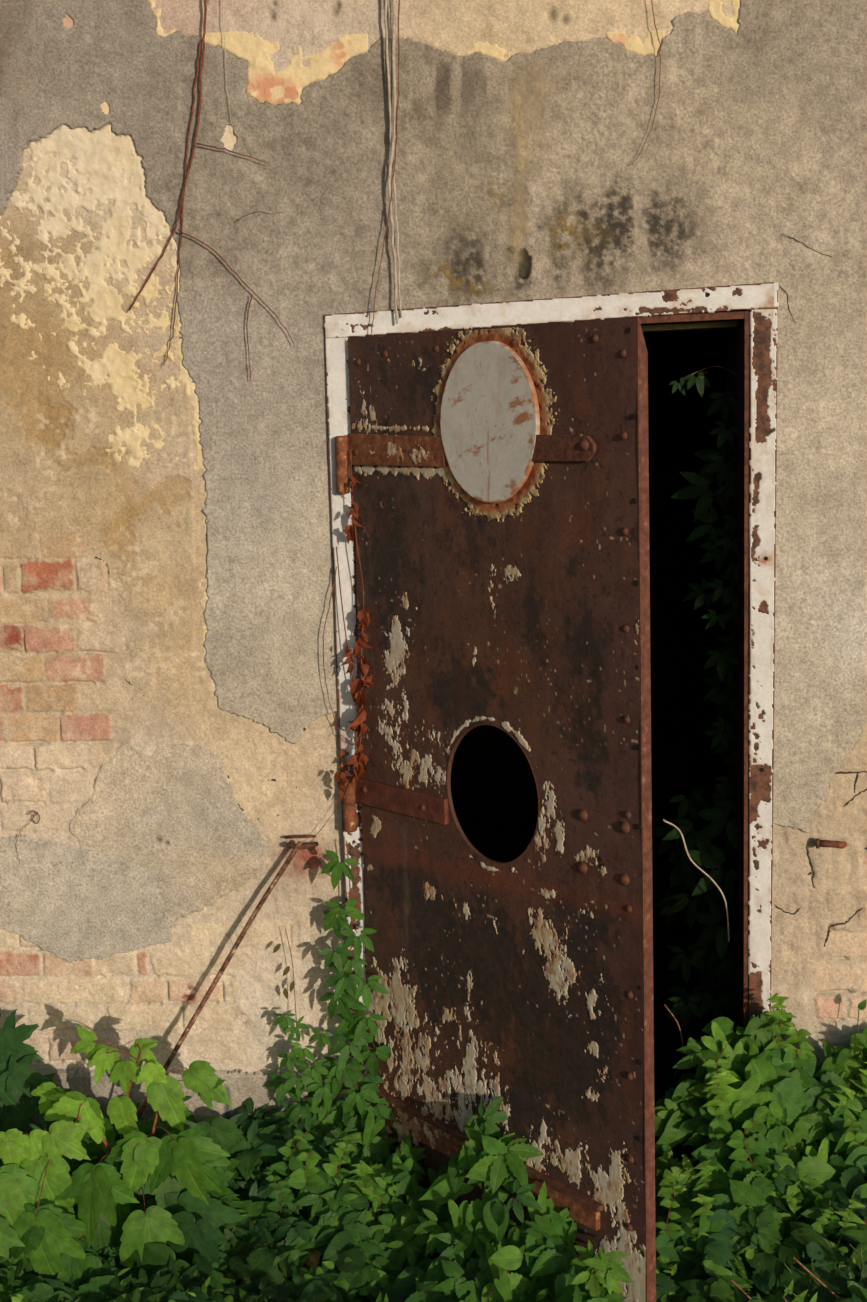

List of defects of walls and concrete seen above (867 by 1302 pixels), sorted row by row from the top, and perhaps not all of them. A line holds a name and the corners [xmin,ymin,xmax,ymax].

flaking render [148,0,740,105]
flaking render [0,124,867,1150]
crack [834,771,867,807]
crack [774,846,815,915]
crack [824,908,863,946]
peeling [525,1118,646,1302]